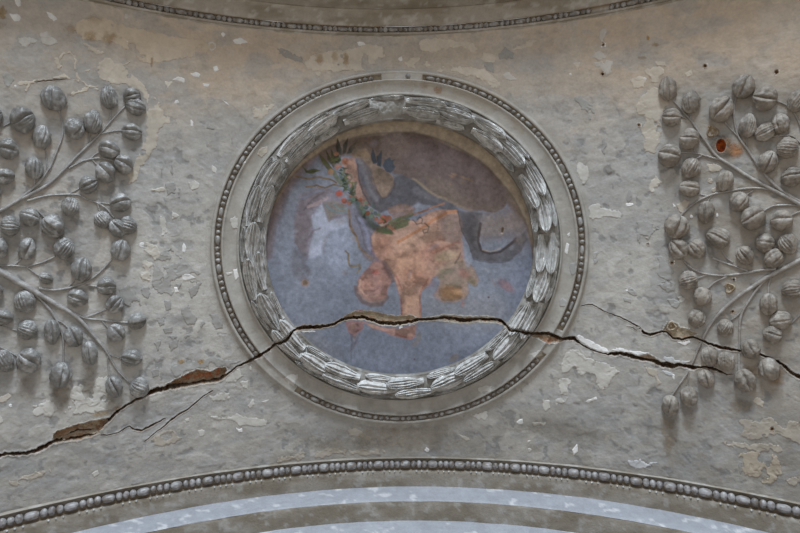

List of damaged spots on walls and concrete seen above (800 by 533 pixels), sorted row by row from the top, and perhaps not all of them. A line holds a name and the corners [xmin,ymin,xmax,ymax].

peeling [630,61,669,154]
corrosion [710,136,742,156]
peeling [118,242,223,352]
peeling [33,376,116,443]
flaking render [164,366,252,389]
crack [0,302,800,460]
peeling [542,335,690,411]
peeling [724,417,800,486]